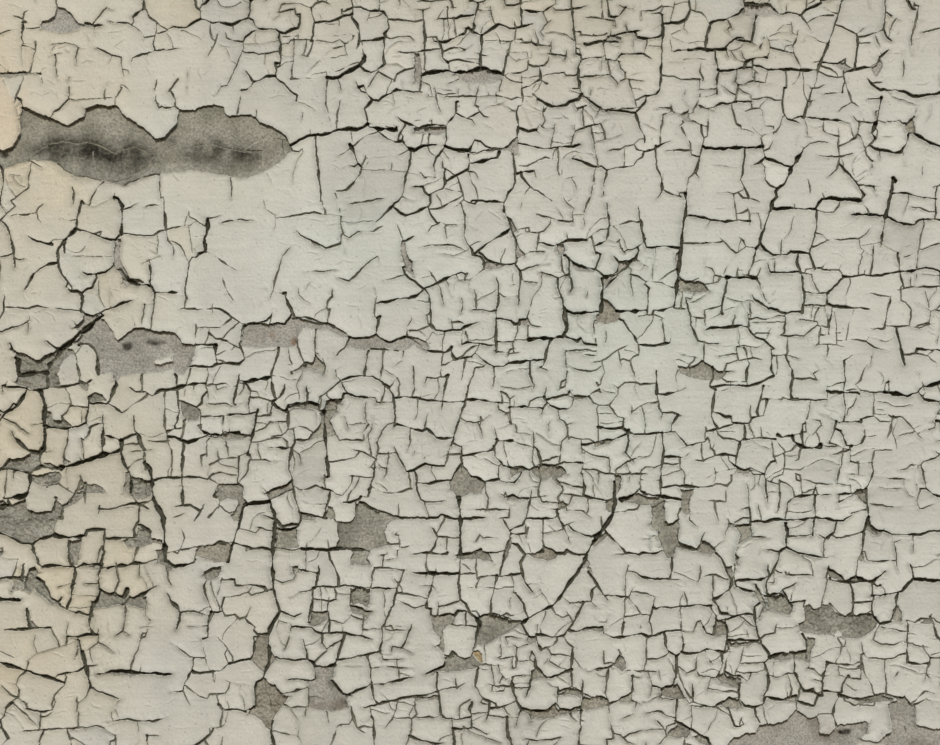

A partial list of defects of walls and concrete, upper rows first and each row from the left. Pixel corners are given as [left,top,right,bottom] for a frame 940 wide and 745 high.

crack [0,11,43,109]
crack [51,42,130,117]
crack [867,78,940,98]
peeling [0,102,291,186]
crack [0,160,44,272]
peeling [16,314,196,389]
crack [853,399,940,449]
peeling [0,484,106,543]
peeling [276,504,399,566]
peeling [0,567,59,605]
crack [97,630,172,676]
peeling [754,586,878,664]